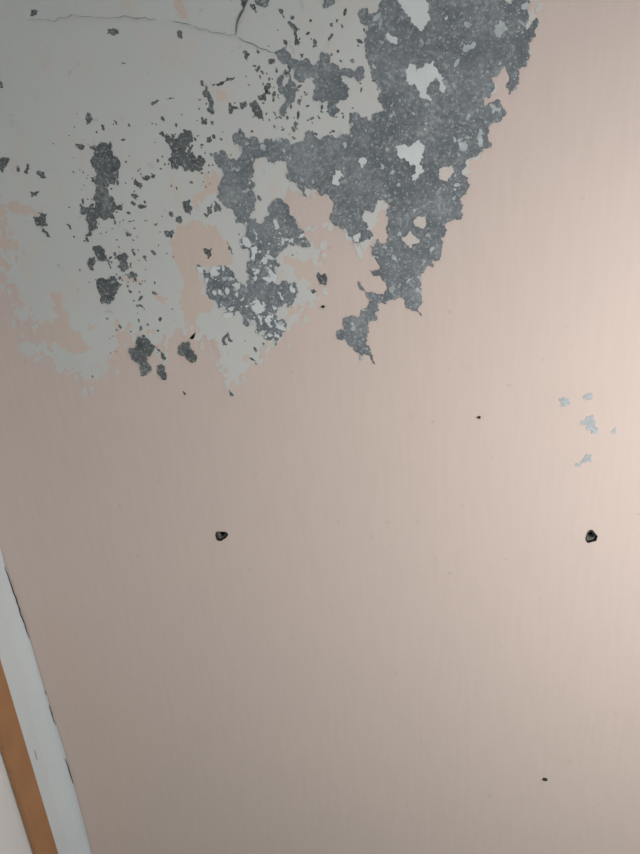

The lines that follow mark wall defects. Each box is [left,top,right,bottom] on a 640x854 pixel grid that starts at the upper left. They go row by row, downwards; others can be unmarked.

crack [30,0,276,53]
peeling [0,0,543,397]